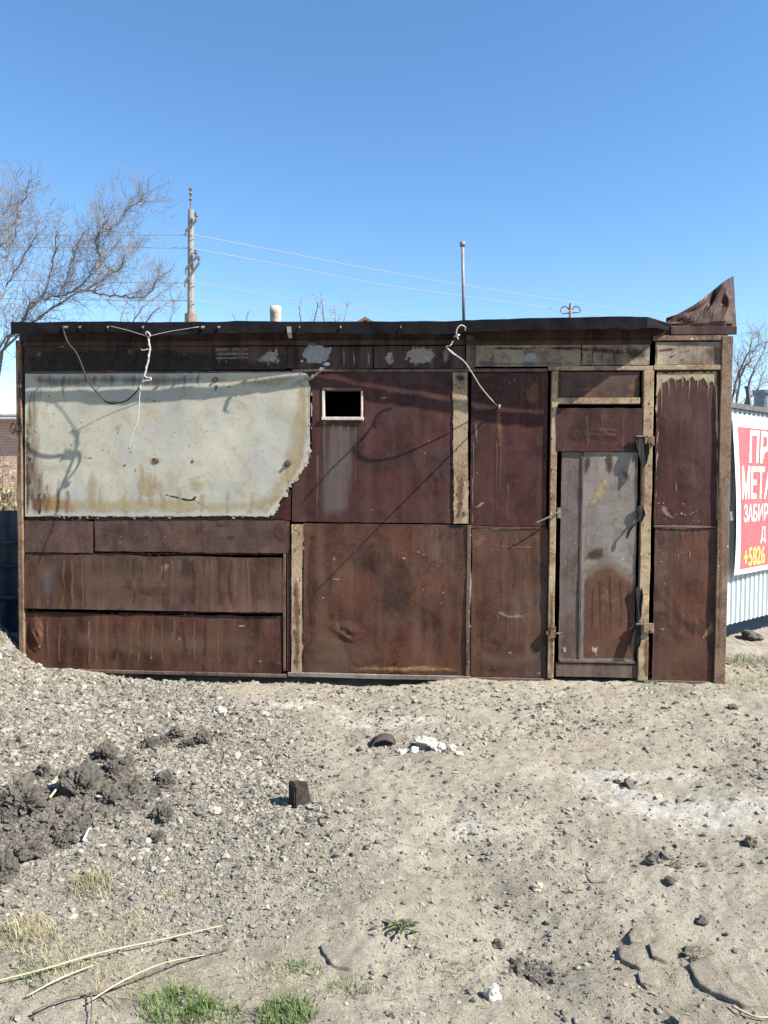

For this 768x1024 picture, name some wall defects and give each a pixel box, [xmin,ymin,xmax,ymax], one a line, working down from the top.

peeling [27,343,355,520]
peeling [385,347,448,366]
peeling [655,371,718,460]
rust [18,351,315,665]
rust [584,548,649,675]